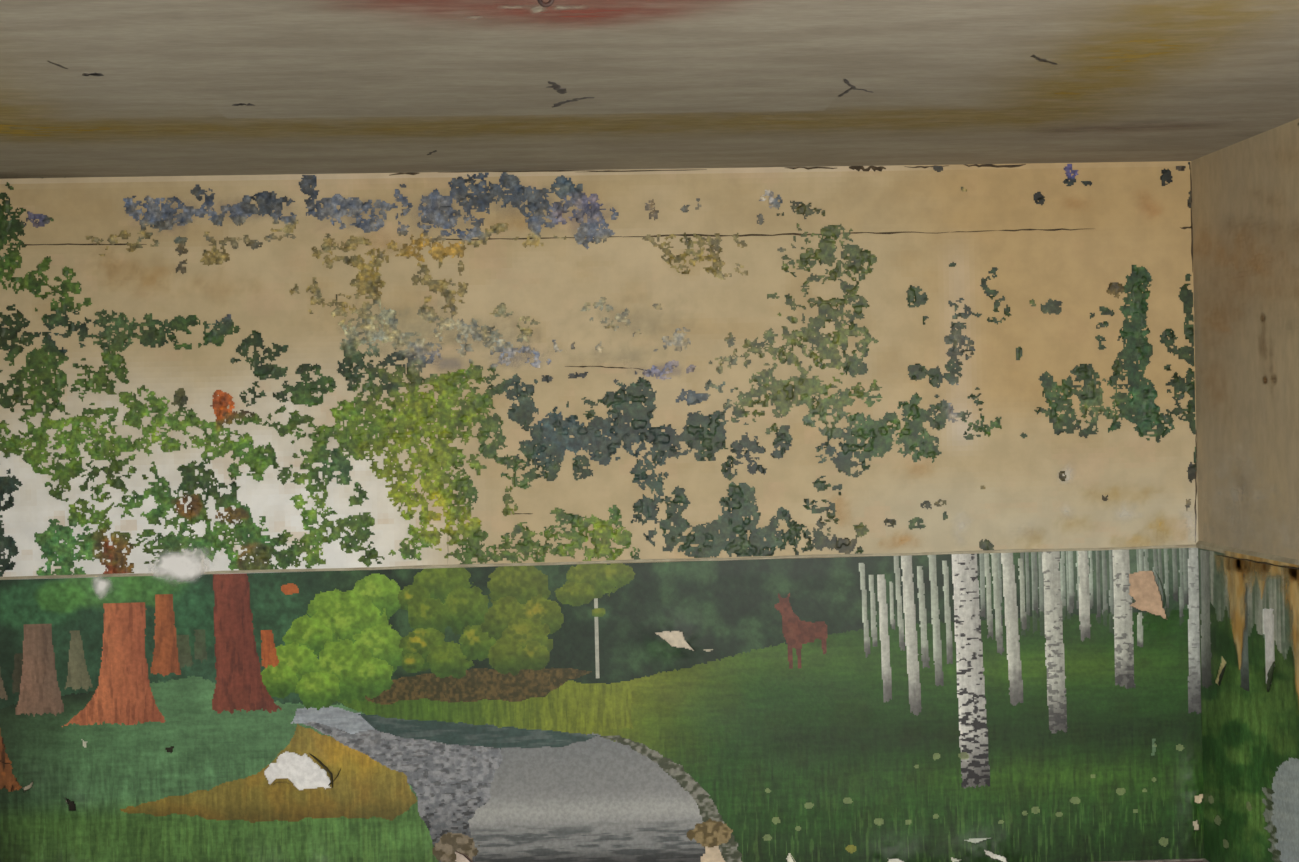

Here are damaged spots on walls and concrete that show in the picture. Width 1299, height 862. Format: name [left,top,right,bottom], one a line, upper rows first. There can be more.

peeling [1063,164,1092,186]
peeling [1160,162,1191,186]
peeling [1033,192,1045,205]
peeling [0,172,1012,595]
peeling [1029,265,1197,483]
flaking render [1263,608,1275,684]
flaking render [264,751,331,790]
flaking render [701,846,725,862]